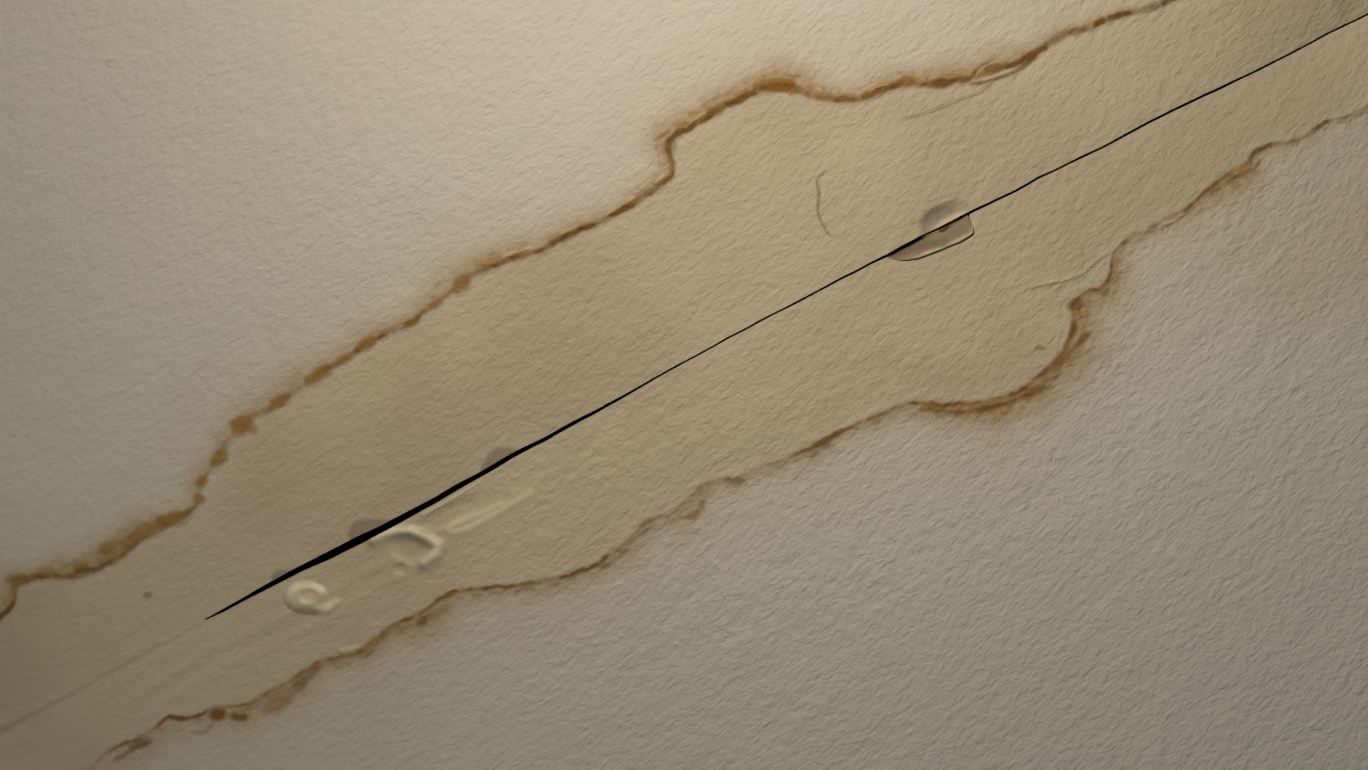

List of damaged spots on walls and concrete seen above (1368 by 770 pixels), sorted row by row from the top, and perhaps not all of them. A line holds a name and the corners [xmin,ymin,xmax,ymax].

crack [0,618,206,734]
water stain [89,659,318,768]
water stain [0,0,1122,563]
water stain [145,101,1368,770]
crack [205,13,1368,620]